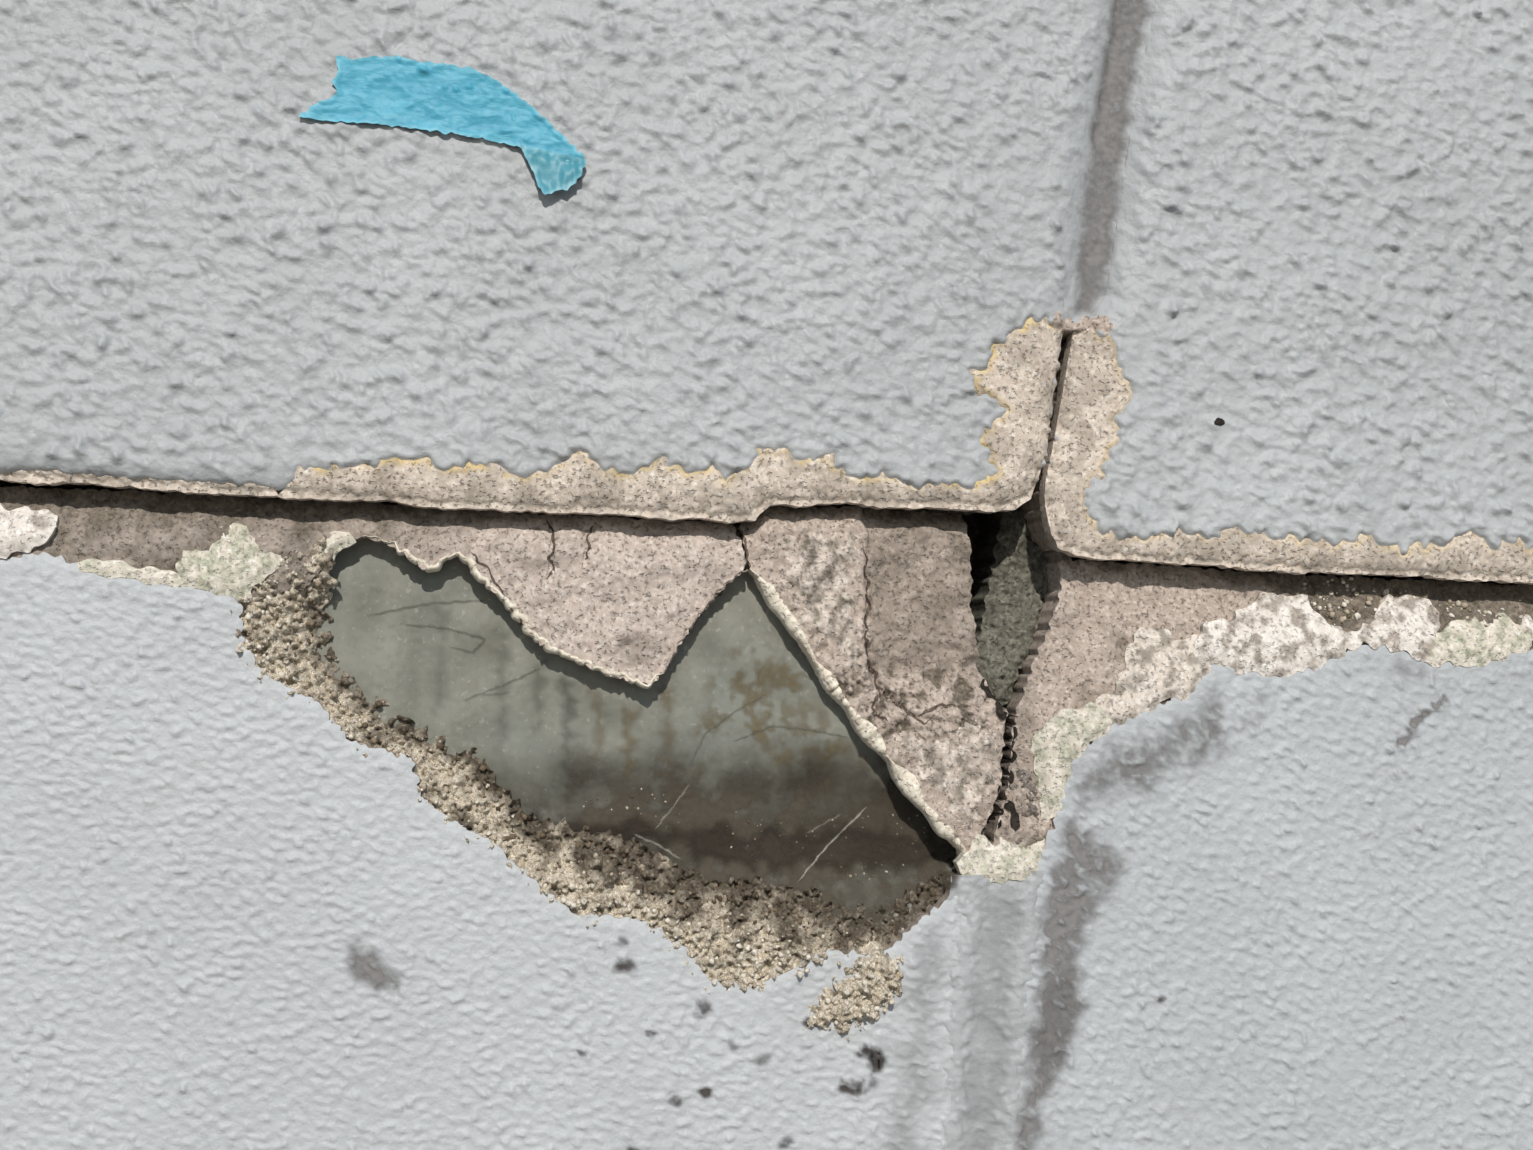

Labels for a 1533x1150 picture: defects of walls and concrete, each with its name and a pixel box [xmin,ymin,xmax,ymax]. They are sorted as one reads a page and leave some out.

spalling [0,311,1533,1041]
leakage [1084,705,1220,788]
leakage [1020,823,1121,1150]